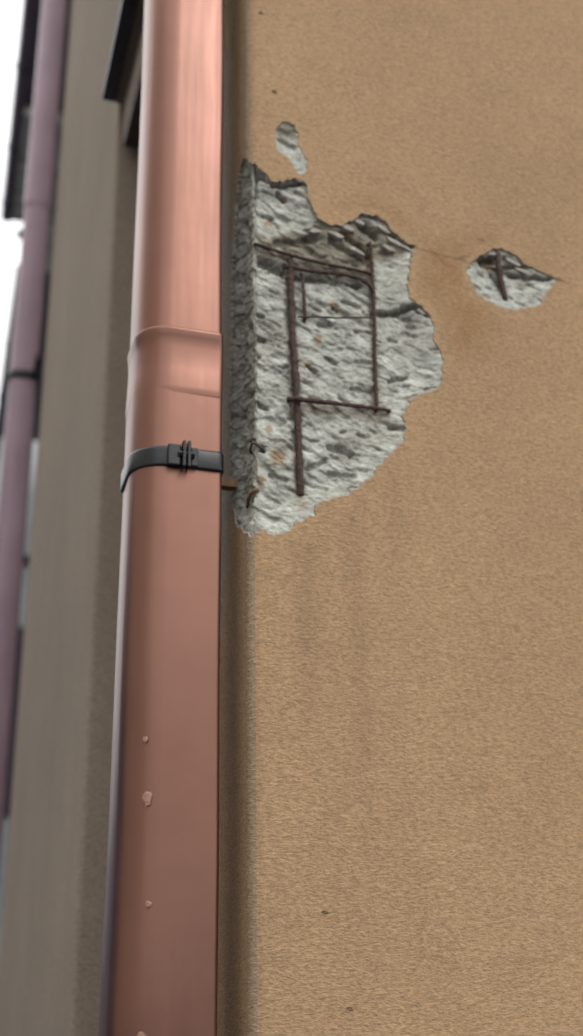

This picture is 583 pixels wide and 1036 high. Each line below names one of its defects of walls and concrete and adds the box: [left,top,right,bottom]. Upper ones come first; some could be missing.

spalling [229,121,444,537]
spalling [467,248,556,311]